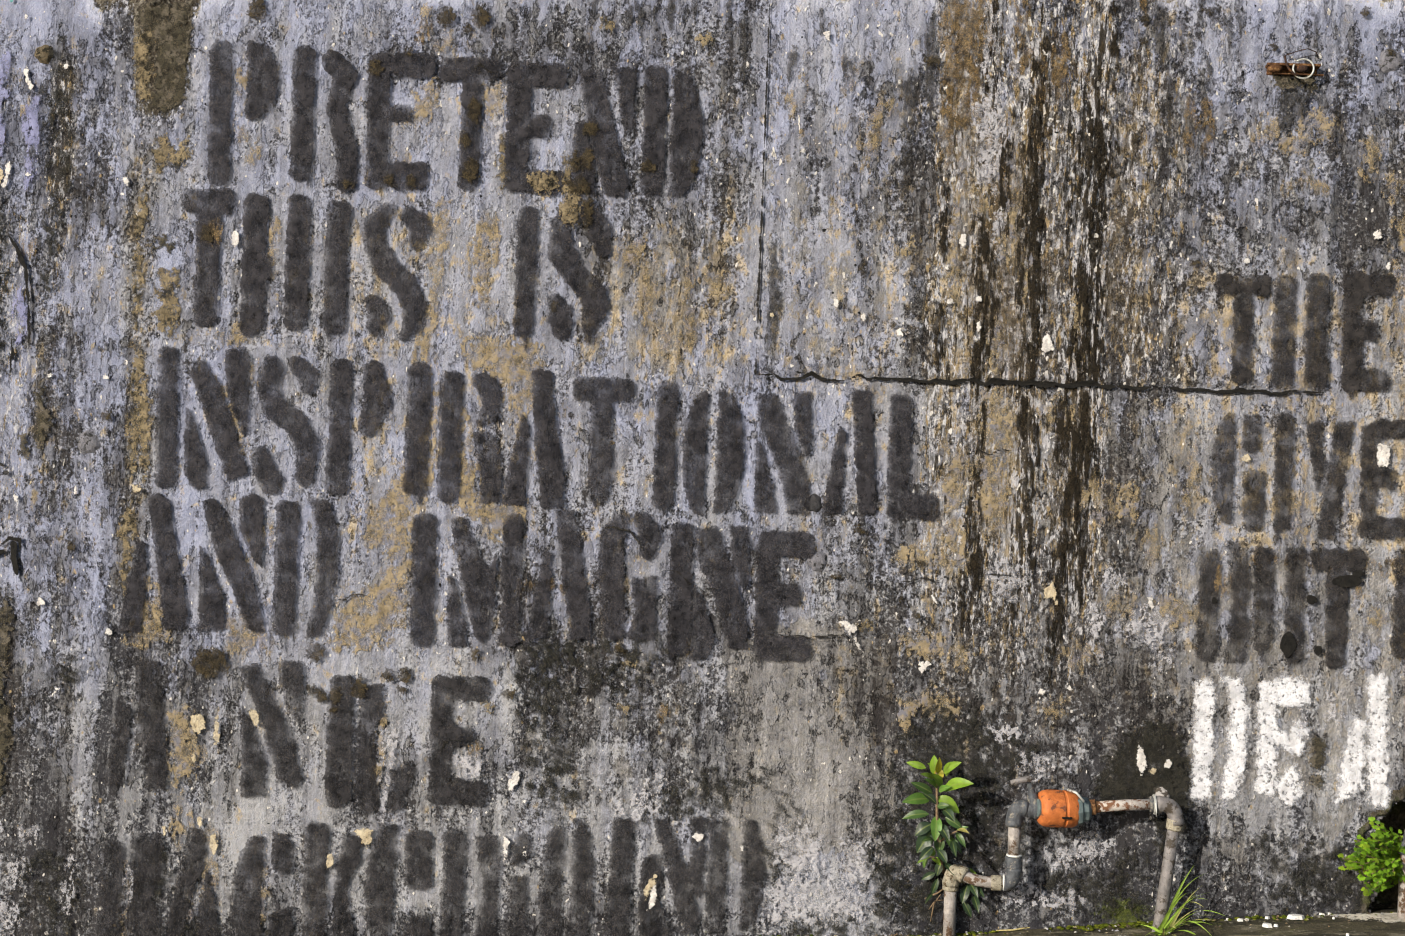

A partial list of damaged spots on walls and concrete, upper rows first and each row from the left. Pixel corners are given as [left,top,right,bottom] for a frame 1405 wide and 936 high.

peeling [132,0,194,179]
leakage [939,186,951,263]
crack [754,4,1329,396]
leakage [763,239,783,350]
leakage [928,297,946,379]
leakage [957,0,1178,686]
leakage [449,741,483,781]
leakage [480,620,669,825]
leakage [613,690,1196,936]
spalling [1355,785,1405,852]
leakage [0,821,85,936]
spalling [1358,870,1398,914]